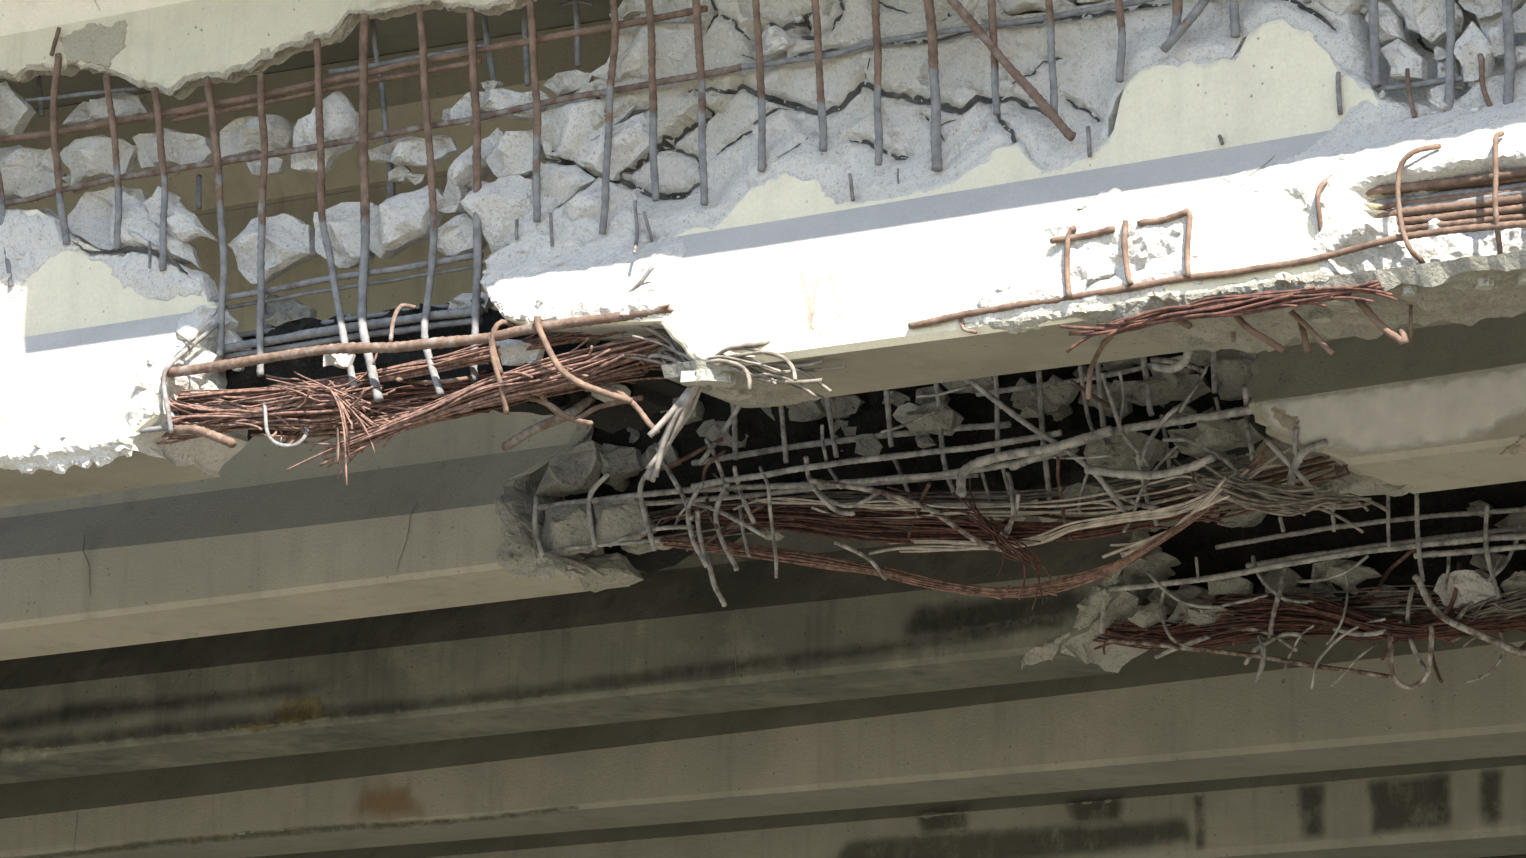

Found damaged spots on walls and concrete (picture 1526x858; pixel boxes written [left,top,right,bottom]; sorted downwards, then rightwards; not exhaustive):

spalling [59,20,127,70]
spalling [480,0,1526,353]
spalling [0,209,216,474]
spalling [661,358,823,408]
spalling [1271,406,1300,430]
spalling [494,494,593,580]
spalling [1021,562,1133,670]